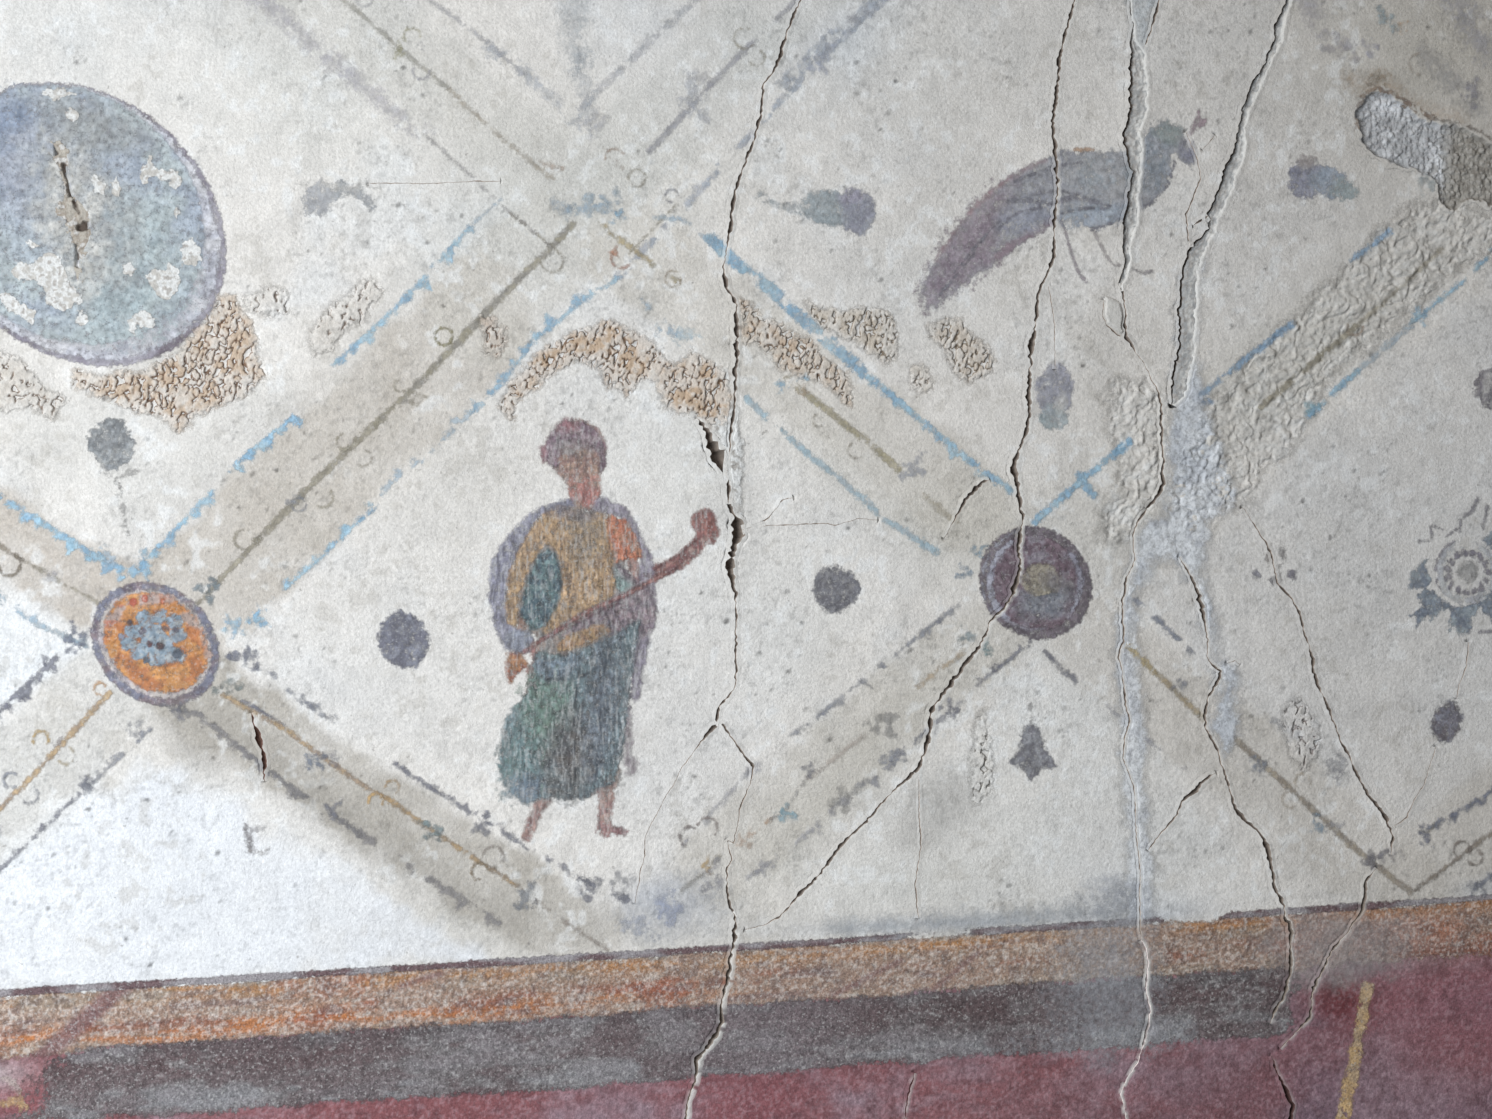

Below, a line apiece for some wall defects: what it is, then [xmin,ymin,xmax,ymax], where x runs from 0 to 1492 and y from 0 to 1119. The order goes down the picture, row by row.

spalling [0,285,290,434]
spalling [307,276,385,357]
spalling [497,319,745,515]
spalling [740,296,934,408]
spalling [925,316,997,386]
spalling [1096,85,1492,544]
crack [630,0,1081,1119]
crack [1098,0,1440,1119]